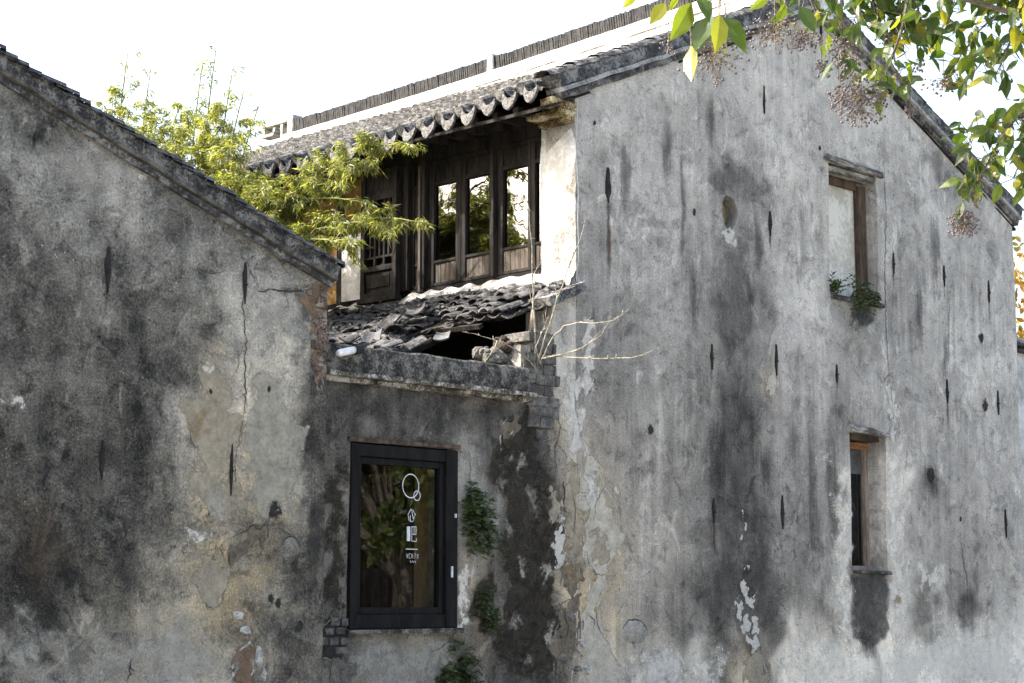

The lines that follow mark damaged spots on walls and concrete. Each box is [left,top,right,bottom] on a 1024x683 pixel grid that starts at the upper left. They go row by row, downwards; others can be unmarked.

peeling [721,227,737,247]
crack [206,249,313,463]
flaking render [294,282,330,394]
peeling [179,362,312,573]
peeling [499,316,625,683]
water stain [782,432,1023,683]
water stain [3,635,46,679]
spalling [229,611,267,683]
peeling [734,565,771,683]